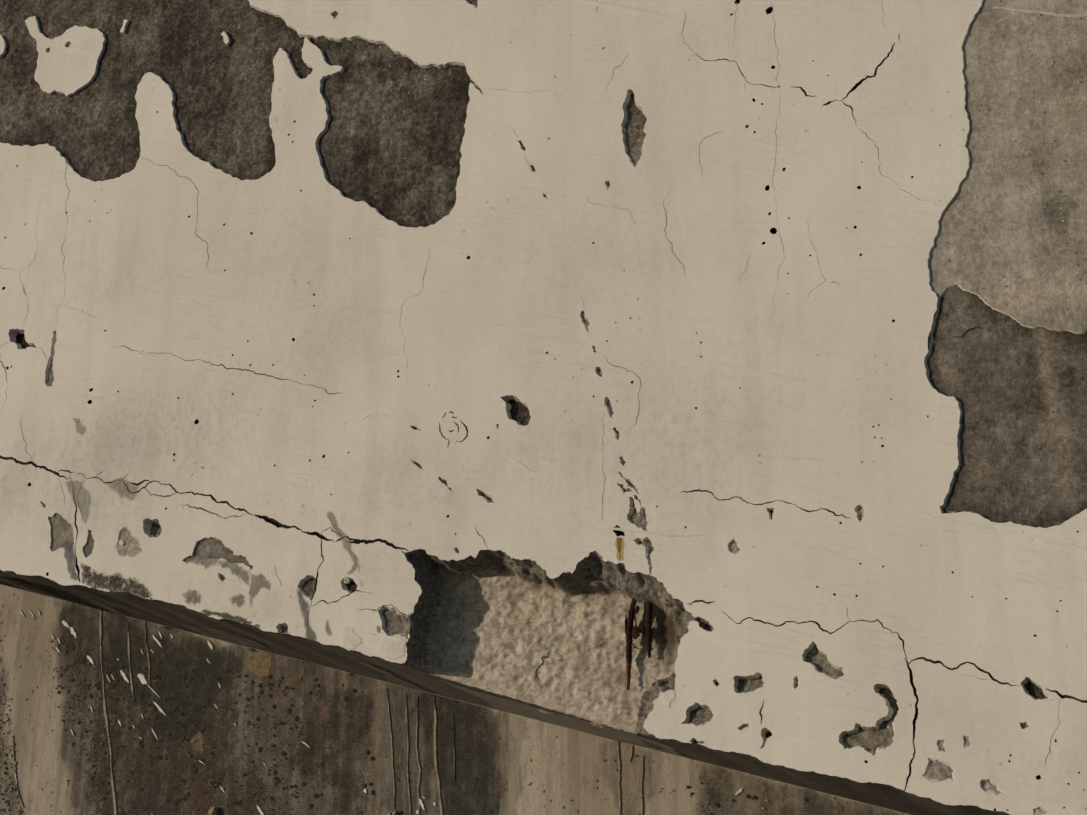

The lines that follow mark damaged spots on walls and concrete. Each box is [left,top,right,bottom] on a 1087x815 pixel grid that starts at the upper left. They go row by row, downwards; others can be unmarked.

peeling [0,0,483,228]
peeling [621,89,647,167]
crack [681,0,942,309]
peeling [924,0,1087,528]
crack [0,157,412,624]
peeling [487,395,531,439]
leakage [0,542,688,815]
spalling [378,456,714,737]
rust [615,538,624,560]
crack [688,600,1021,791]
peeling [839,684,899,763]
crack [1044,689,1087,769]